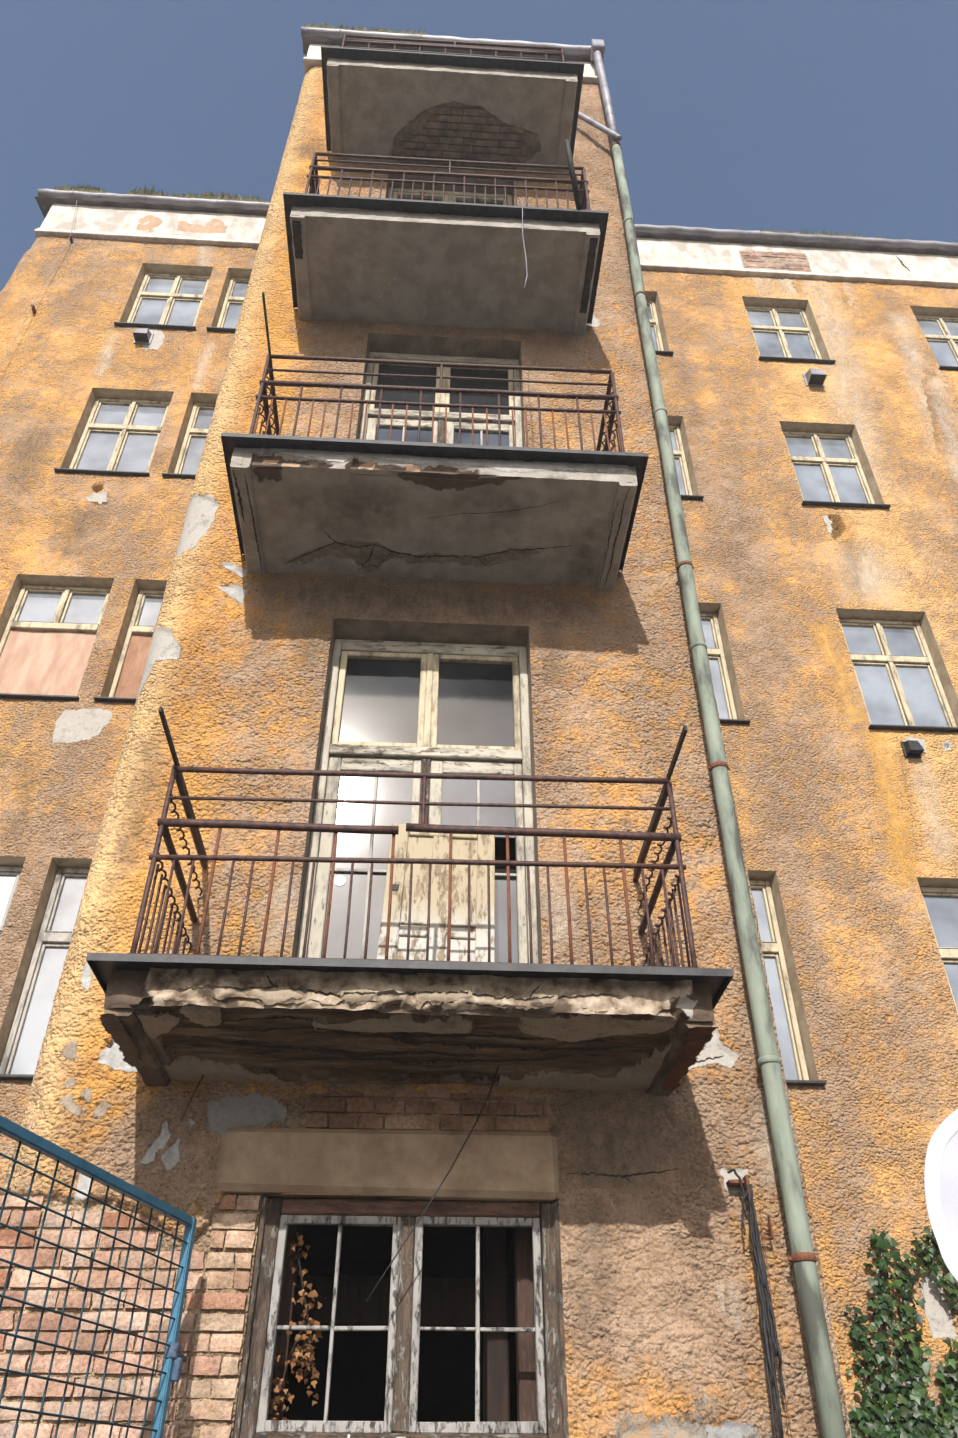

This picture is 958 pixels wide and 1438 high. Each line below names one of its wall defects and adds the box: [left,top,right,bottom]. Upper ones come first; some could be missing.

flaking render [391,102,541,170]
flaking render [739,250,812,272]
peeling [250,448,629,491]
peeling [174,493,220,559]
crack [233,470,572,571]
crack [600,488,630,585]
peeling [129,626,181,721]
peeling [52,708,112,743]
flaking render [59,1040,79,1061]
flaking render [59,1077,111,1121]
spalling [81,963,739,1171]
peeling [606,1392,773,1438]